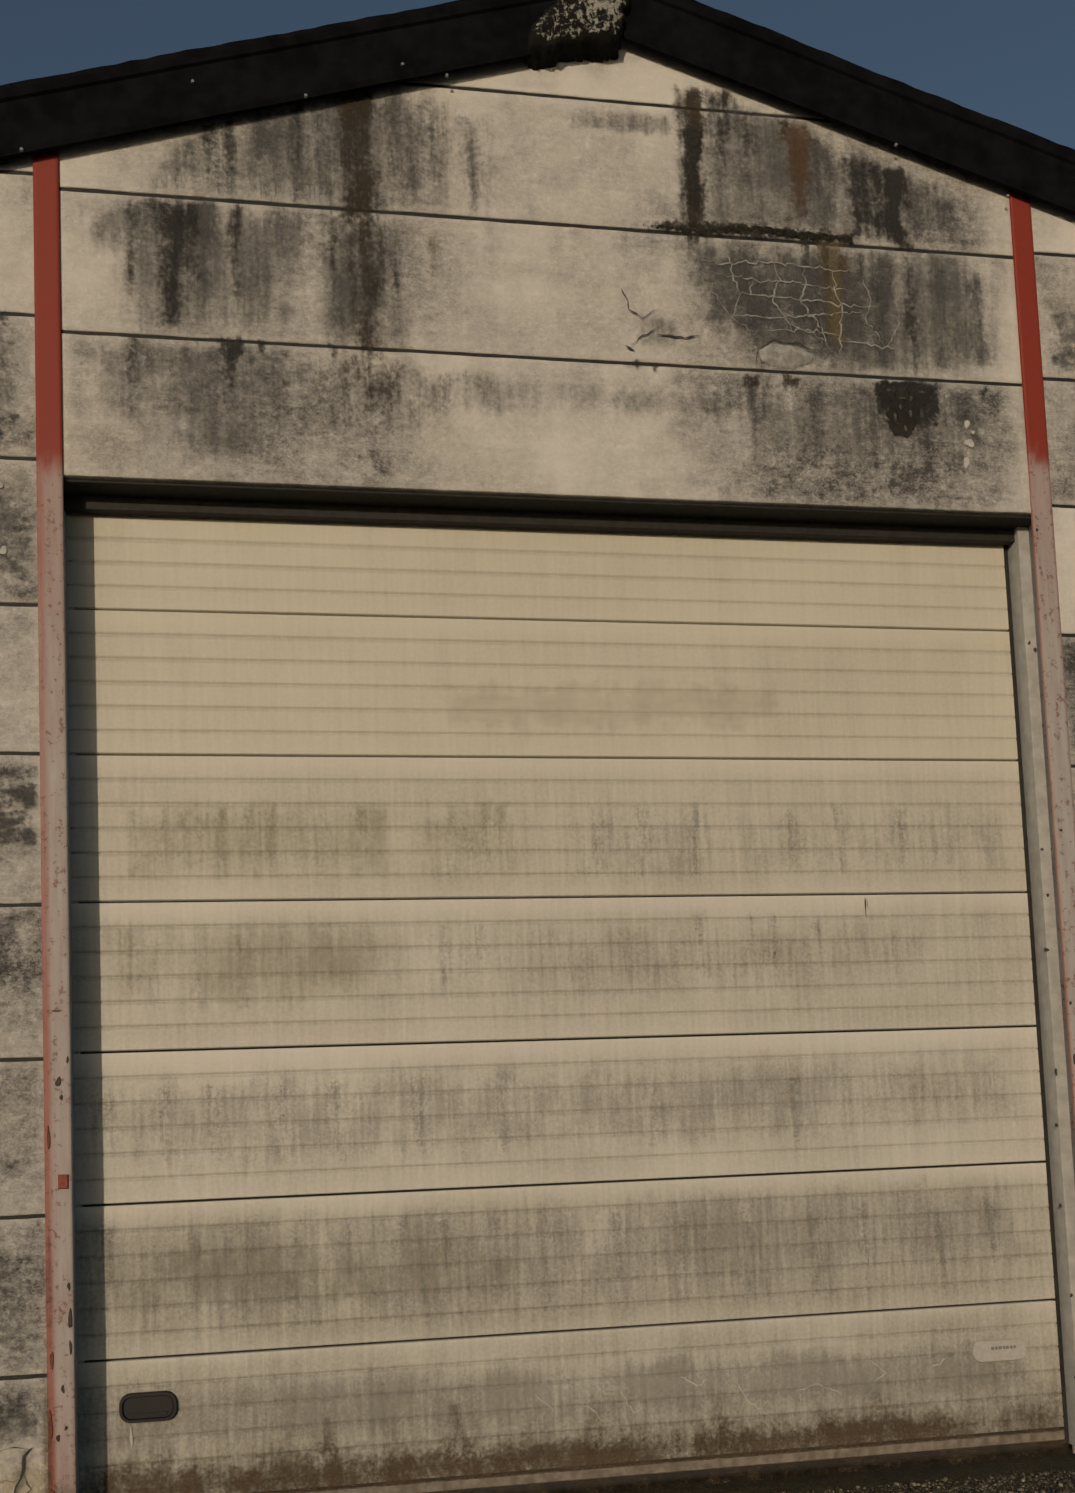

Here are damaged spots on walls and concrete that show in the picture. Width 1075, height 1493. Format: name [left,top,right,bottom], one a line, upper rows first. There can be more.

rust [781,122,811,204]
water stain [97,199,300,324]
water stain [174,92,414,408]
crack [621,246,900,360]
water stain [665,87,984,367]
water stain [187,337,274,450]